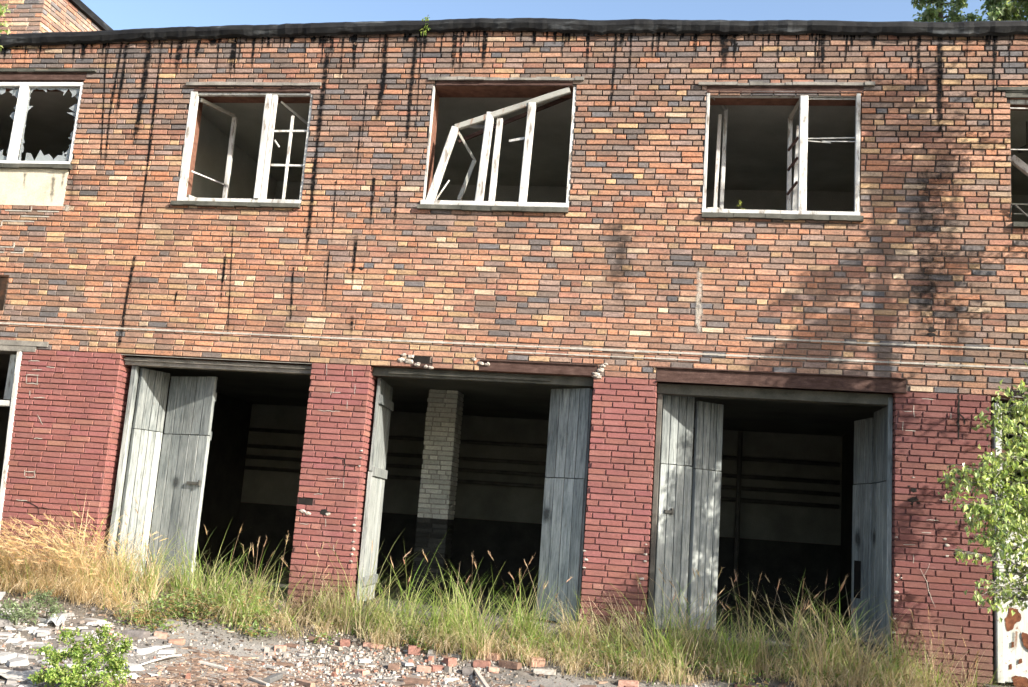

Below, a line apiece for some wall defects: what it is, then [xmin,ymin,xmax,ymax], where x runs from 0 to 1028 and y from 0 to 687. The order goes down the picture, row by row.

leakage [66,42,129,164]
leakage [133,35,365,251]
leakage [356,34,389,176]
leakage [403,32,427,147]
leakage [441,30,488,68]
leakage [606,33,633,115]
leakage [710,33,780,65]
leakage [811,33,879,73]
leakage [937,37,951,131]
leakage [118,257,136,345]
leakage [221,233,233,332]
corrosion [1005,607,1028,687]